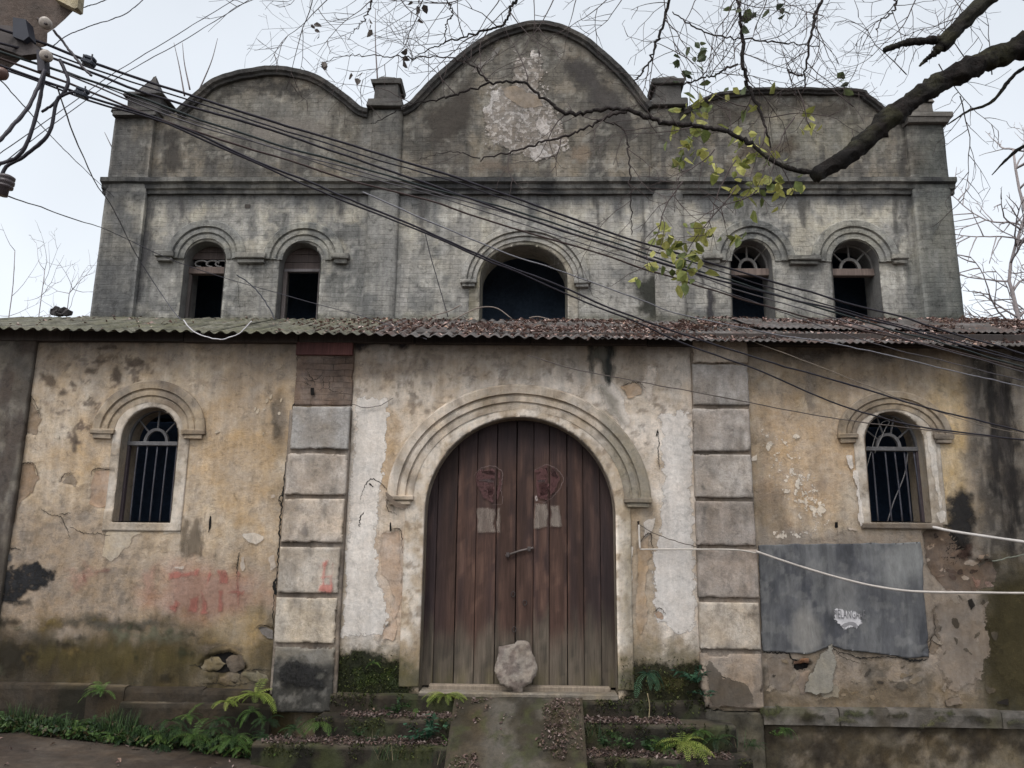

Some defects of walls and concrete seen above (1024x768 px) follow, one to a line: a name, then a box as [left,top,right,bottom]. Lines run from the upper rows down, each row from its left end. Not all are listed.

flaking render [482,50,569,162]
flaking render [15,462,39,521]
leakage [2,554,54,605]
crack [41,509,110,537]
crack [272,462,286,635]
peeling [340,394,403,641]
leakage [589,346,621,420]
peeling [600,366,657,429]
peeling [631,409,698,635]
peeling [752,425,864,539]
flaking render [922,432,1009,706]
leakage [974,355,1022,546]